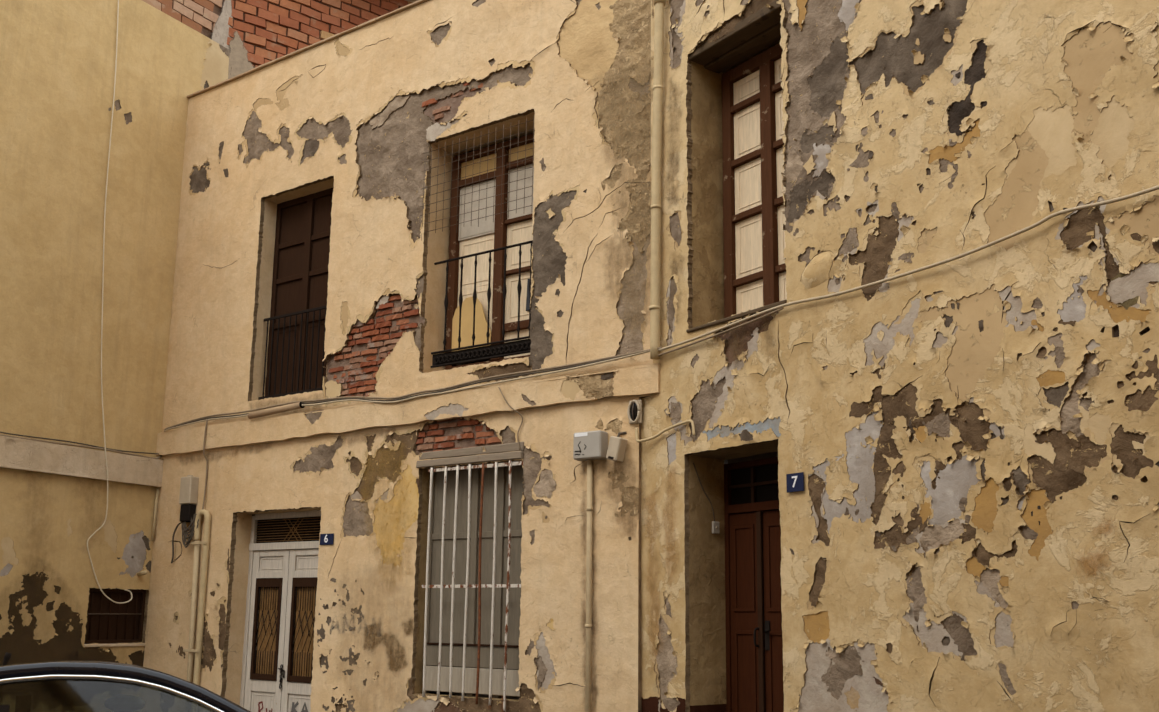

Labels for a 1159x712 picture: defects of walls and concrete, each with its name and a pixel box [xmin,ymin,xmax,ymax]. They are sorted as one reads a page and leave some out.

peeling [189,141,229,195]
spalling [238,59,536,249]
spalling [557,0,654,401]
spalling [667,0,993,302]
spalling [305,272,428,424]
spalling [468,185,587,384]
peeling [791,21,1159,712]
spalling [291,403,557,567]
damp [0,570,145,667]
peeling [323,687,355,712]
peeling [317,578,364,675]
spalling [394,618,557,712]